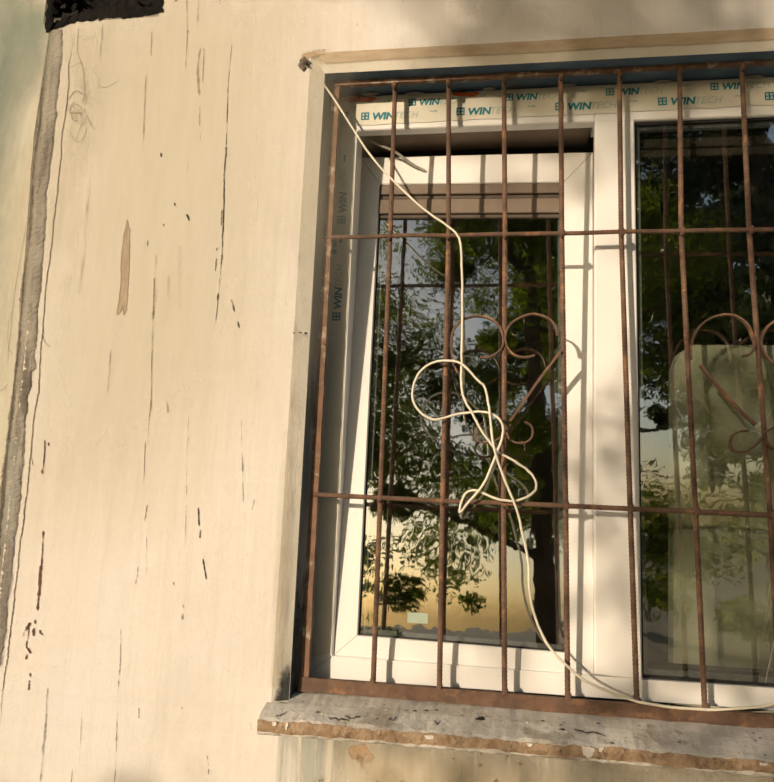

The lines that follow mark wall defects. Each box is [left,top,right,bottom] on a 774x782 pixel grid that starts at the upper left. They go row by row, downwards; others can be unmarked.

crack [1,28,116,704]
leakage [0,531,14,664]
leakage [36,531,44,610]
spalling [257,719,774,774]
leakage [297,737,773,782]